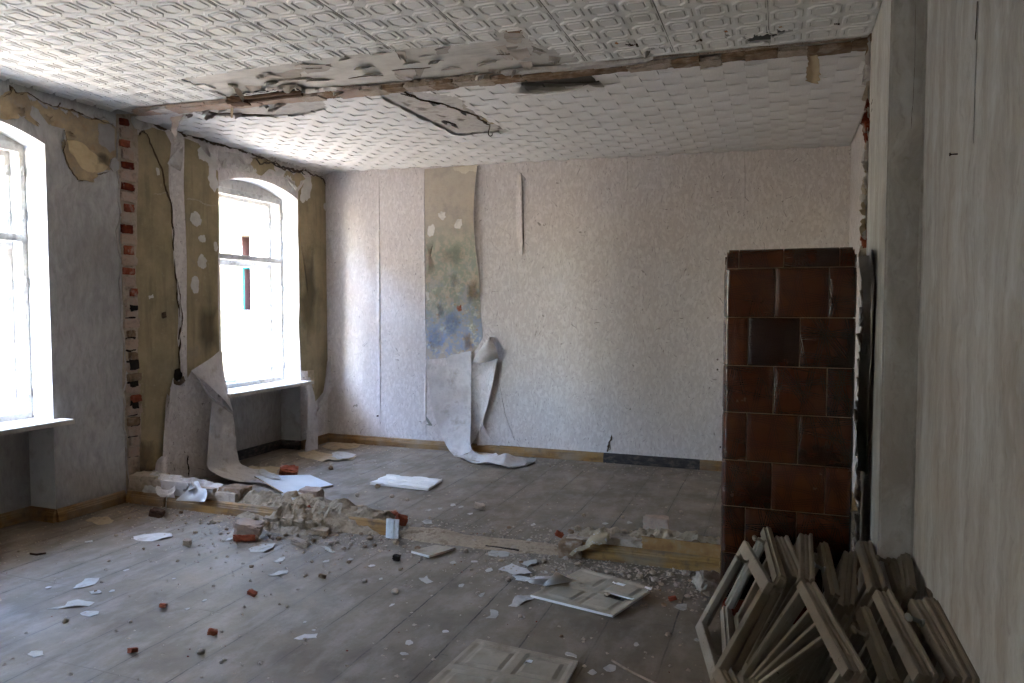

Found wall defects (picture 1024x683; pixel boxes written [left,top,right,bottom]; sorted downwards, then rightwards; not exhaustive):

flaking render [115,29,872,551]